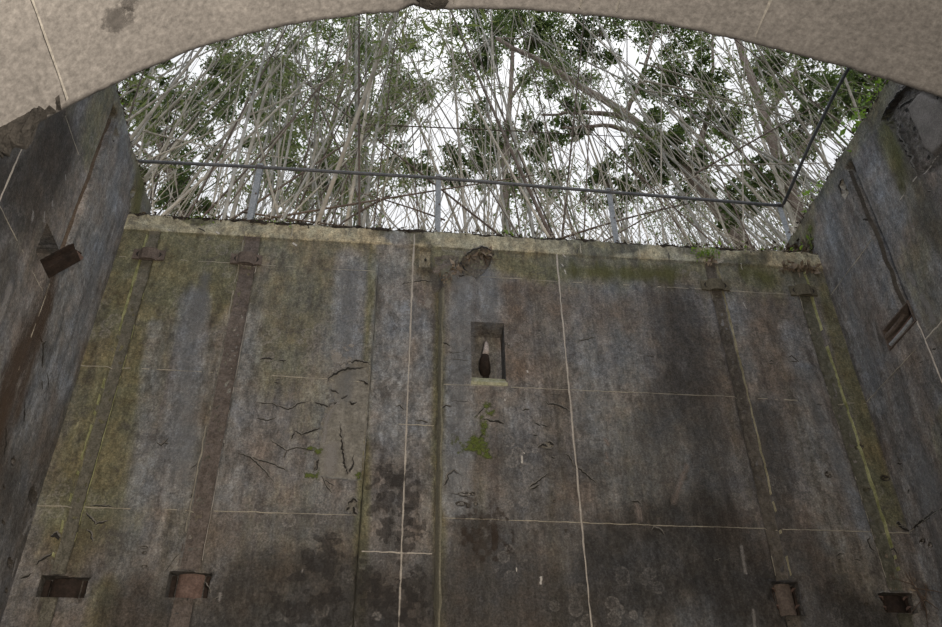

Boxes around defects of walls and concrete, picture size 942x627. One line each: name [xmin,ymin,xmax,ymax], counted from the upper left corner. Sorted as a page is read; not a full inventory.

spalling [881,86,942,177]
spalling [434,245,494,279]
crack [235,357,338,493]
crack [396,392,570,447]
crack [443,469,471,497]